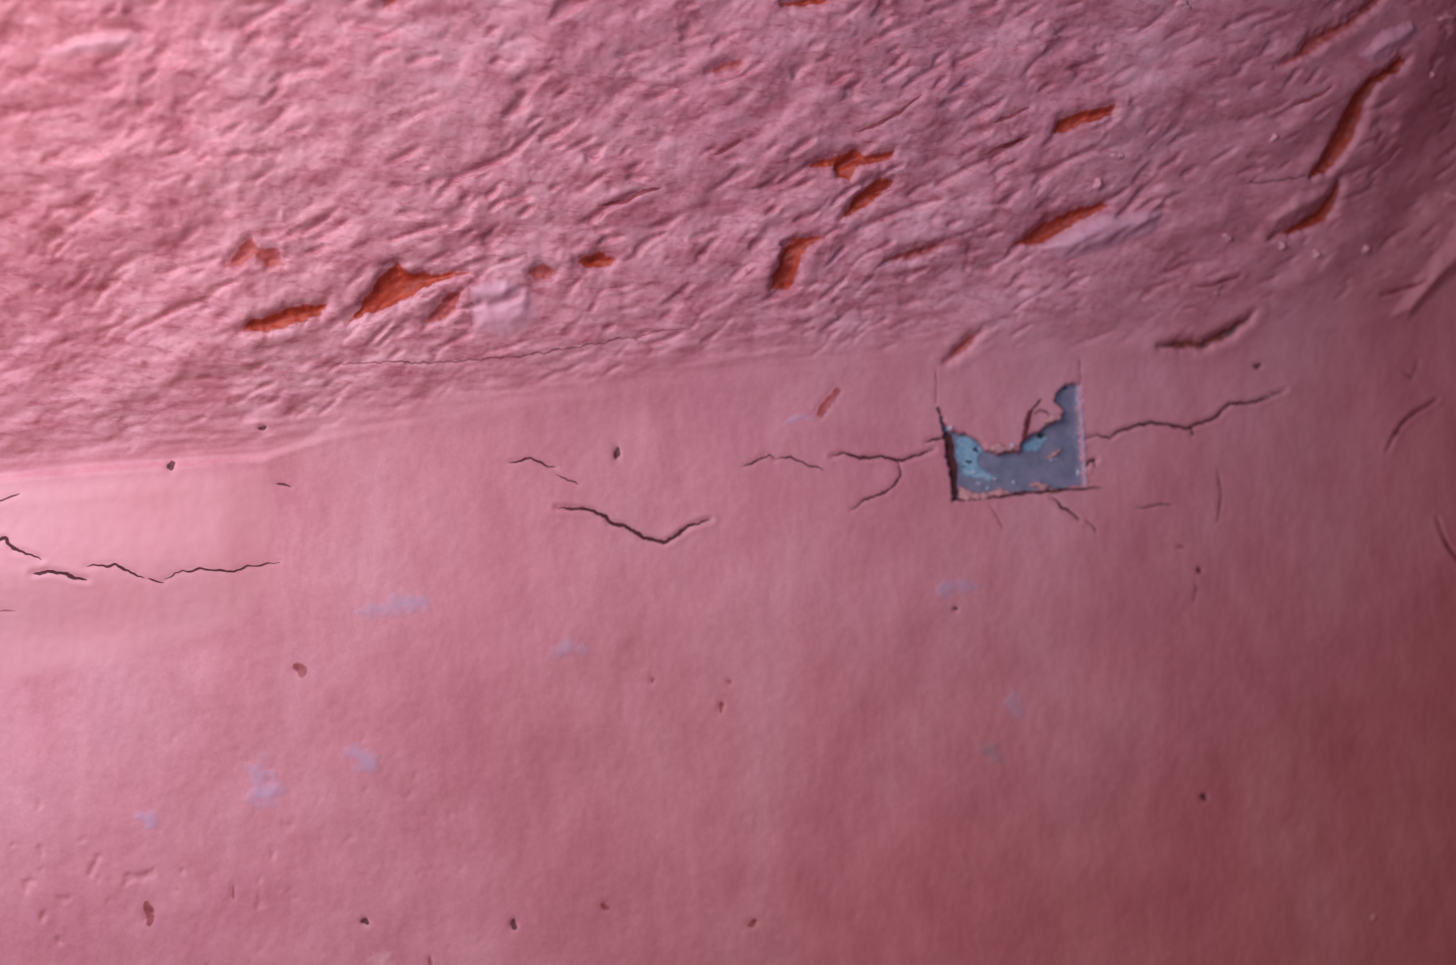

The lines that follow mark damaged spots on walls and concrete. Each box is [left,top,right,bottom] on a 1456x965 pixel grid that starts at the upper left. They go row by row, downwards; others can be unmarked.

spalling [1269,55,1406,238]
spalling [808,149,895,219]
spalling [1014,202,1108,246]
spalling [347,261,469,324]
spalling [769,234,824,291]
crack [509,457,709,544]
crack [744,437,942,510]
spalling [936,382,1100,501]
crack [1085,390,1283,467]
crack [1387,368,1436,450]
crack [0,536,279,583]
crack [1437,519,1456,558]